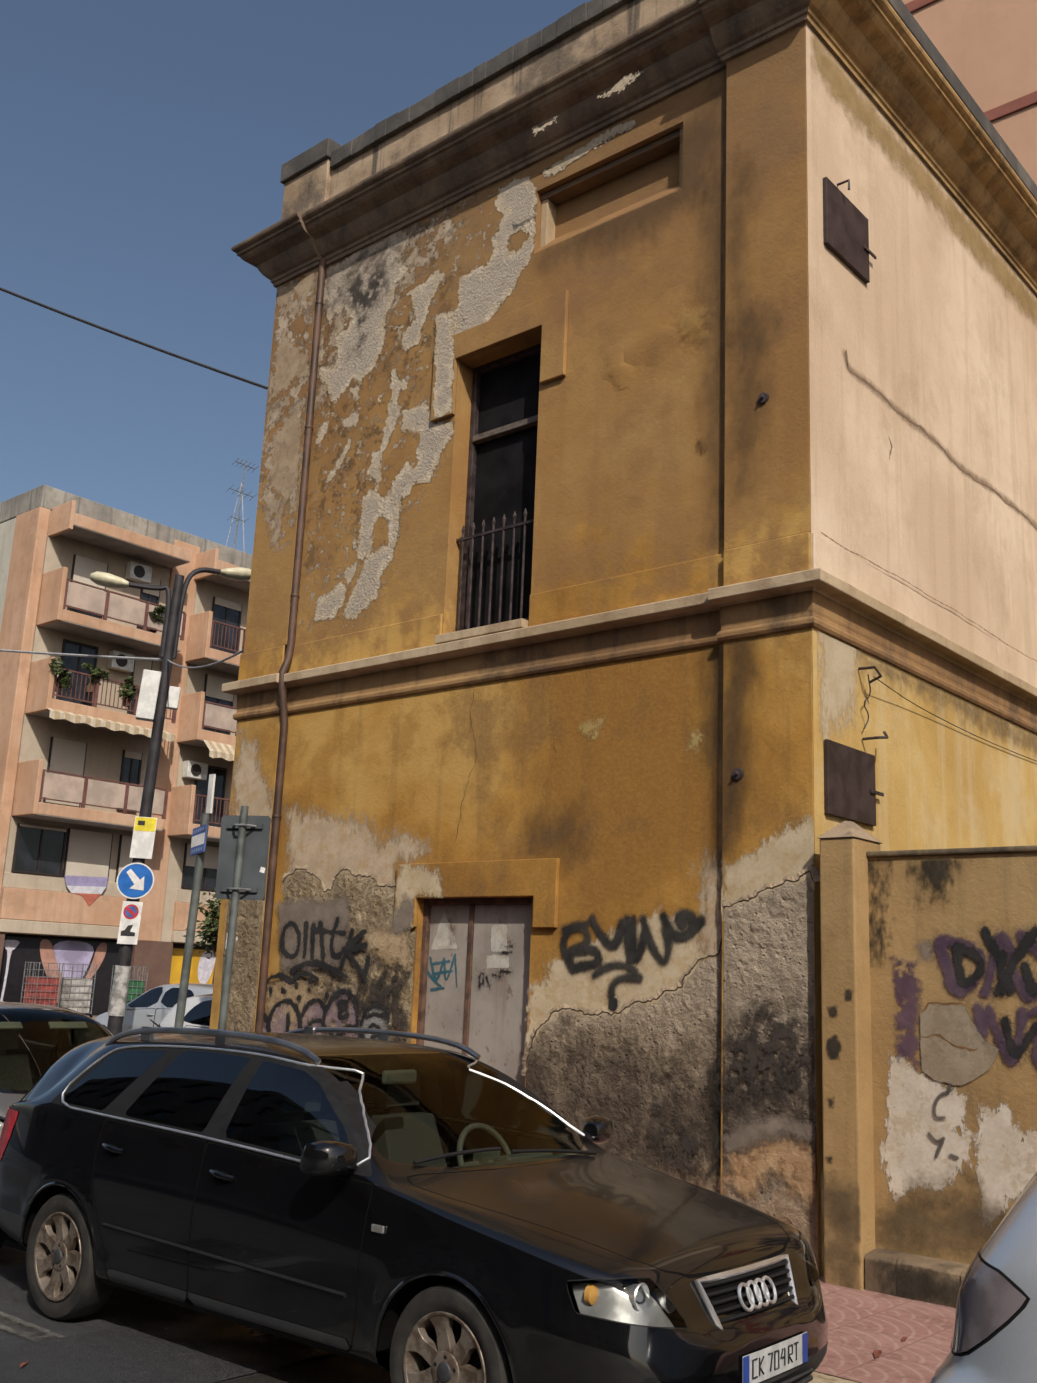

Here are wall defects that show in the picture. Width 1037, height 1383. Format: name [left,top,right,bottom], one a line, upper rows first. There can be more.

peeling [257,120,636,622]
spalling [265,973,323,1033]
peeling [229,727,443,971]
peeling [524,815,814,1052]
damp [630,1004,814,1180]
damp [705,639,751,859]
spalling [720,1137,832,1204]